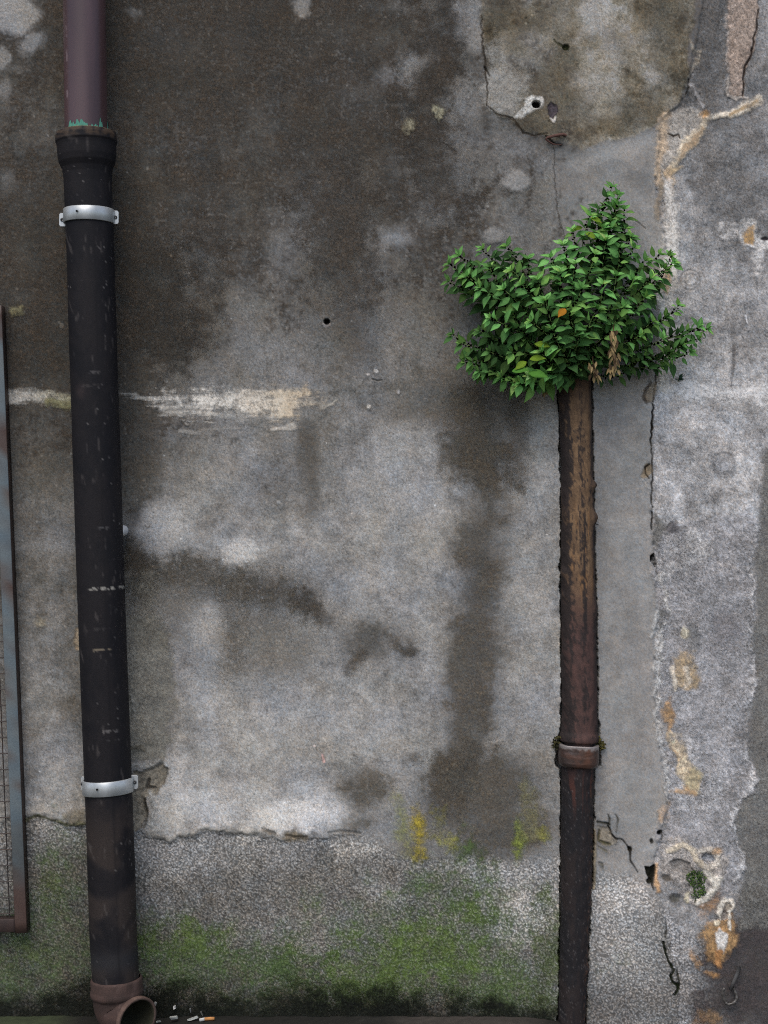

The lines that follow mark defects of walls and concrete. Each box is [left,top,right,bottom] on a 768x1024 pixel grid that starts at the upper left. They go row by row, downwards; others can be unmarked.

flaking render [484,47,558,123]
peeling [122,388,335,431]
crack [649,374,657,529]
peeling [642,0,768,939]
leakage [124,539,324,761]
leakage [424,387,550,860]
flaking render [132,764,307,841]
crack [597,816,633,864]
leakage [0,980,96,1017]
leakage [142,979,557,1021]
crack [663,924,680,996]
corrosion [690,898,737,976]